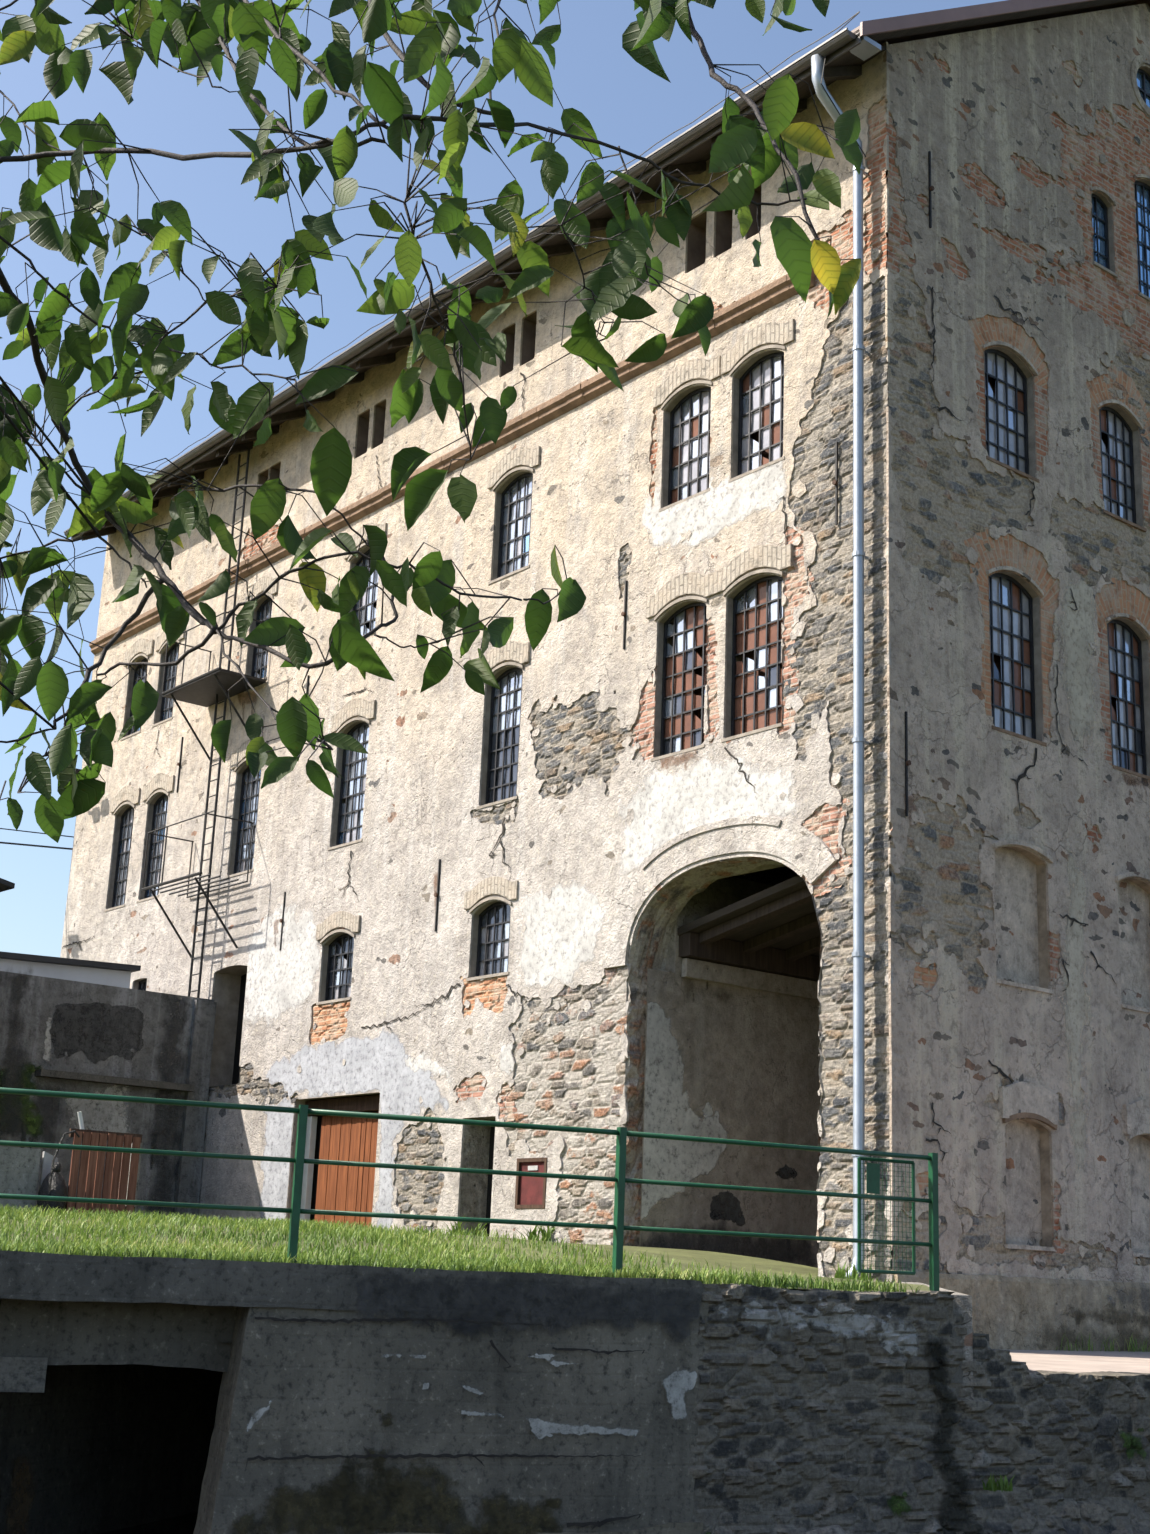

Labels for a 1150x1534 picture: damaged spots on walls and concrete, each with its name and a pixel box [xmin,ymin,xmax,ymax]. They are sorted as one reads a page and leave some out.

flaking render [471,98,1150,1282]
crack [361,983,460,1031]
damp [0,972,129,1148]
flaking render [208,880,727,1245]
damp [149,996,187,1216]
damp [357,1274,700,1341]
damp [532,1354,573,1367]
damp [461,1385,504,1417]
damp [529,1418,638,1439]
damp [663,1370,697,1419]
damp [718,1299,990,1534]